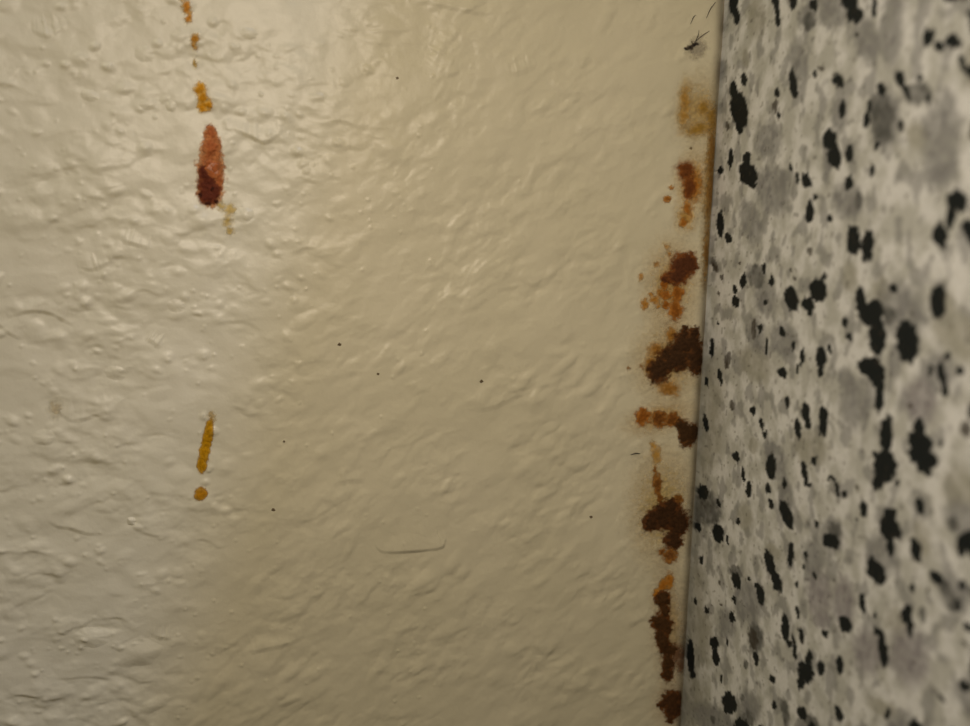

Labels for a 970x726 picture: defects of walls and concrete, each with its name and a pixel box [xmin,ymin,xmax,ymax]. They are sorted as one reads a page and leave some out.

corrosion [181,0,192,22]
corrosion [191,33,199,67]
corrosion [193,81,212,112]
corrosion [195,125,237,234]
corrosion [627,87,716,395]
corrosion [196,411,216,474]
corrosion [635,407,698,448]
corrosion [194,487,208,501]
corrosion [642,442,692,724]